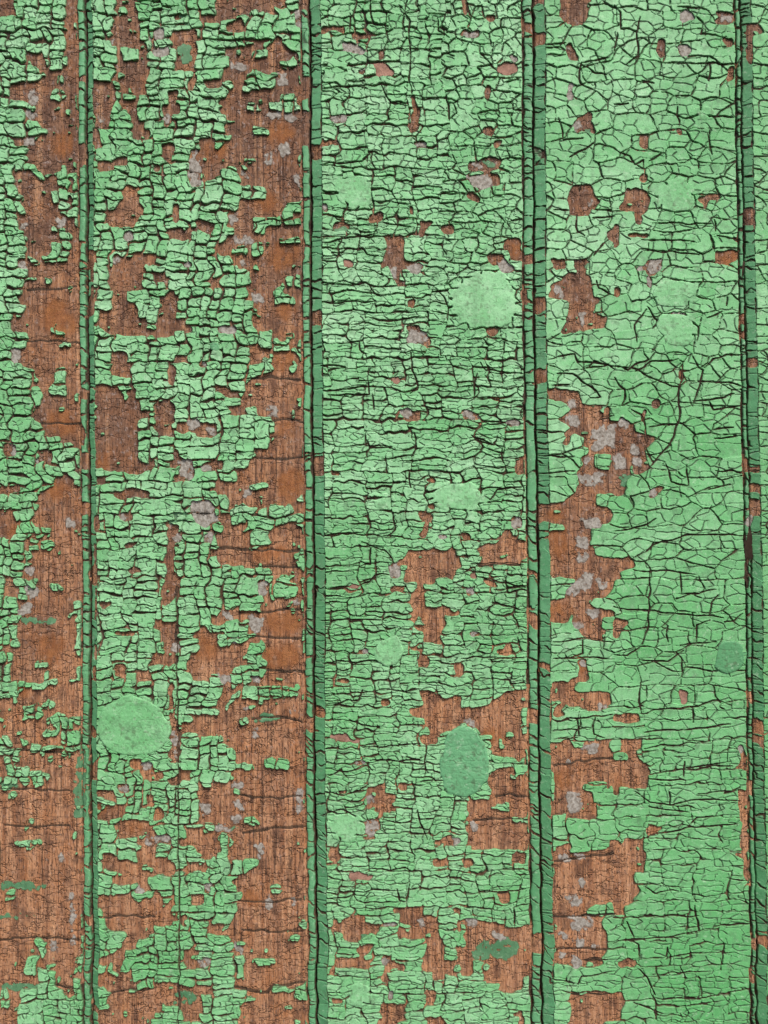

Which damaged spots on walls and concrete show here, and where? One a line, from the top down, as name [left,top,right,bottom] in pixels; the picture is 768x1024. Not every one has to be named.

crack [323,2,457,120]
crack [548,7,654,90]
peeling [485,236,611,335]
crack [550,221,759,490]
crack [472,362,575,500]
peeling [0,0,398,1024]
crack [322,512,396,621]
crack [323,660,436,816]
crack [555,519,753,839]
peeling [335,778,412,839]
peeling [326,824,667,1024]
crack [552,886,748,1014]